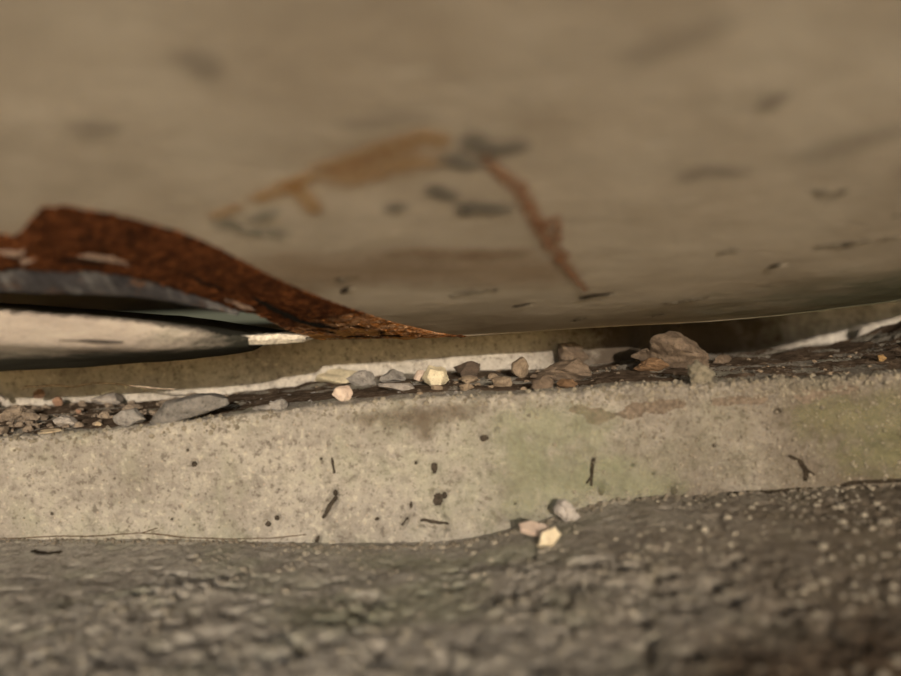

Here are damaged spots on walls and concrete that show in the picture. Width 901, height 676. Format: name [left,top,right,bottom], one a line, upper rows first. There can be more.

rust [482,156,588,292]